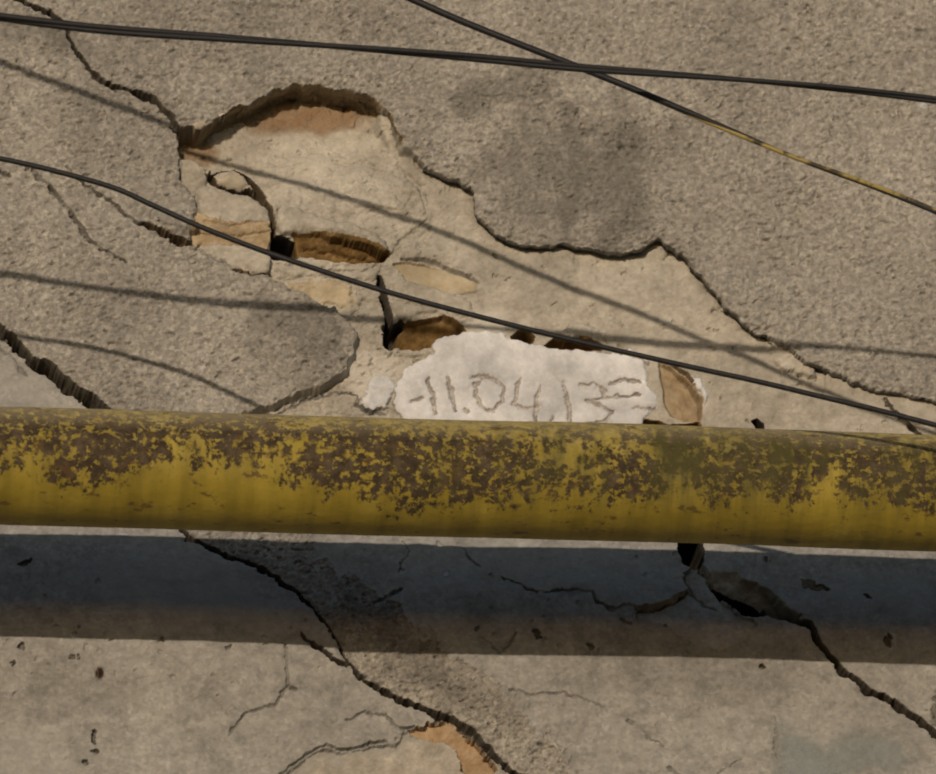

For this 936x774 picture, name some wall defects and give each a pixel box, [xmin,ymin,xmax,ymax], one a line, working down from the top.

crack [13,0,179,136]
crack [0,166,128,264]
crack [66,165,142,225]
spalling [138,83,936,435]
crack [0,322,111,409]
crack [456,544,632,625]
crack [179,530,526,774]
spalling [280,721,509,774]
crack [793,618,936,739]
spalling [925,689,936,727]